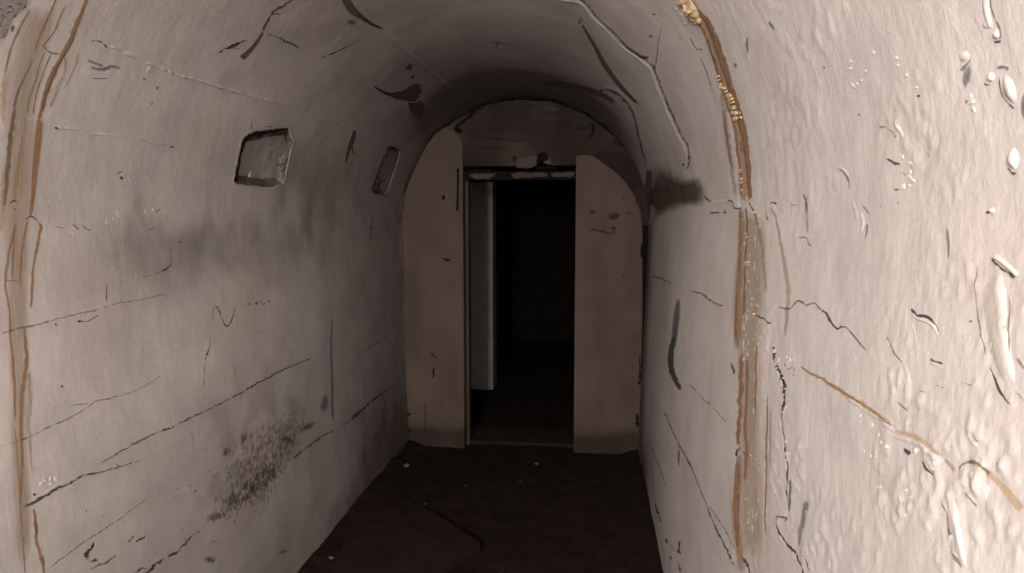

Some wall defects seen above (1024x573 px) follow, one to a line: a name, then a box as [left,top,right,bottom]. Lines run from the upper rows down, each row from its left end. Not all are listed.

crack [209,0,298,60]
crack [600,86,651,168]
leakage [645,171,701,215]
rust [0,0,88,573]
crack [652,276,723,307]
rust [677,0,771,570]
leakage [667,300,682,390]
crack [18,306,388,507]
crack [754,300,942,573]
rust [803,368,952,467]